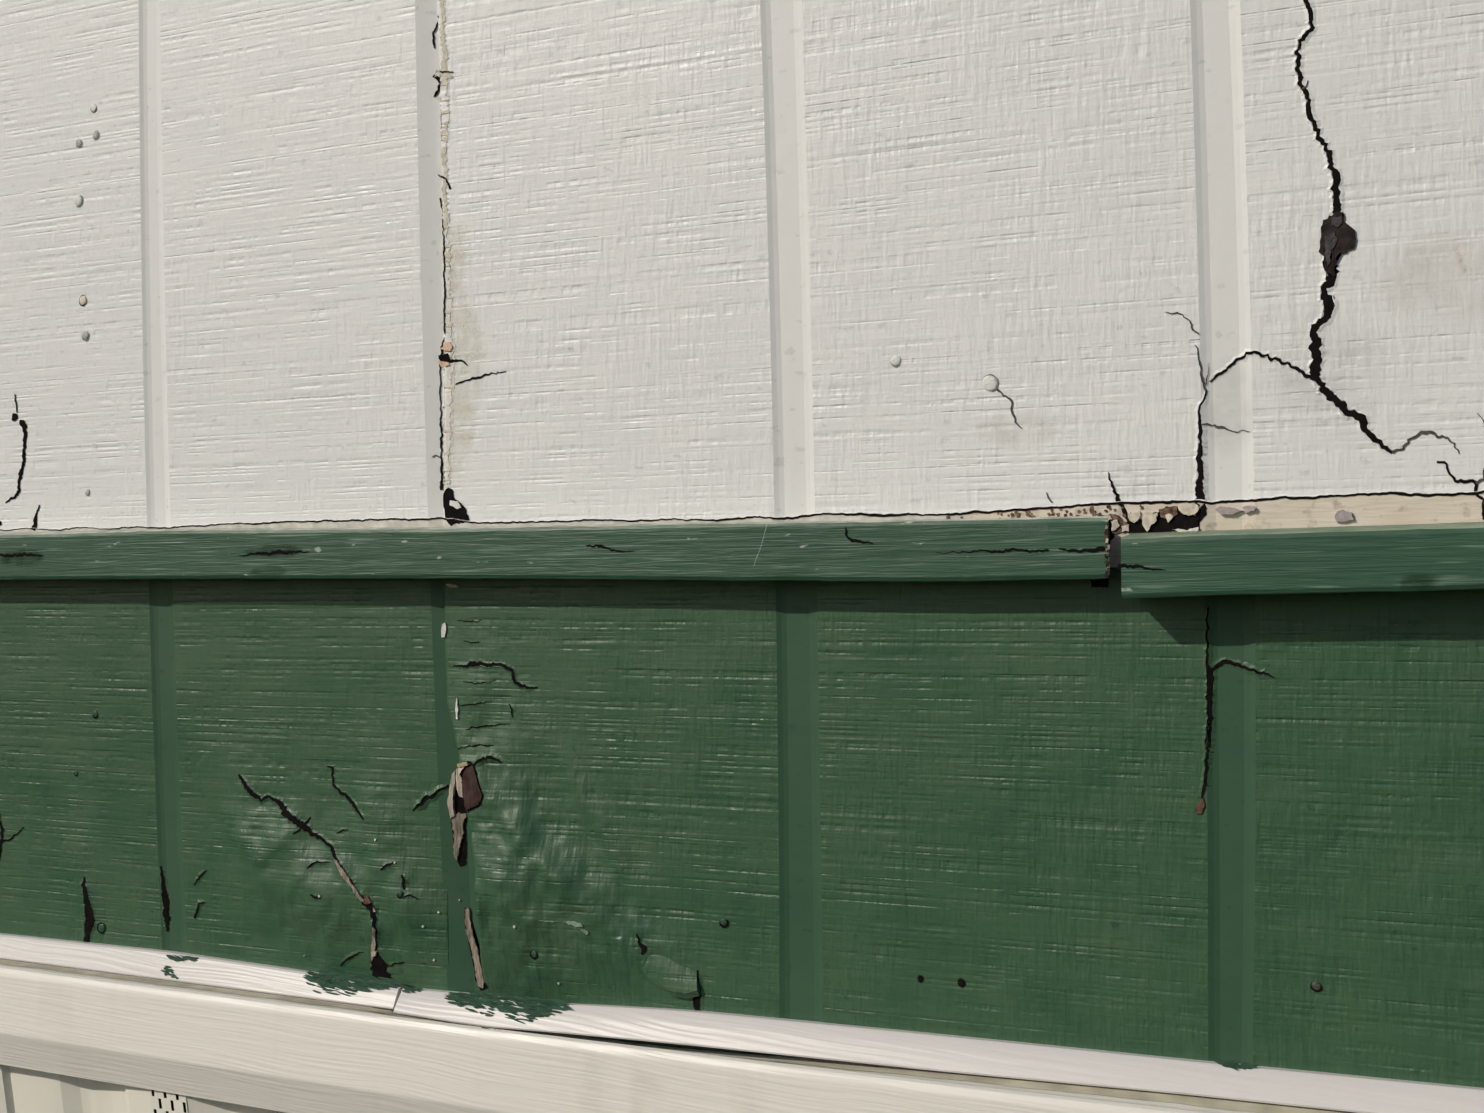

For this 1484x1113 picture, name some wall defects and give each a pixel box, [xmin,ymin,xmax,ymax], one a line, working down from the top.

crack [432,16,453,97]
crack [432,174,506,490]
peeling [0,0,1484,578]
crack [1165,0,1484,520]
crack [0,394,43,558]
crack [453,659,537,692]
crack [1199,607,1275,799]
crack [80,877,97,942]
crack [159,866,172,932]
crack [238,774,392,979]
crack [327,765,364,820]
spalling [450,761,483,866]